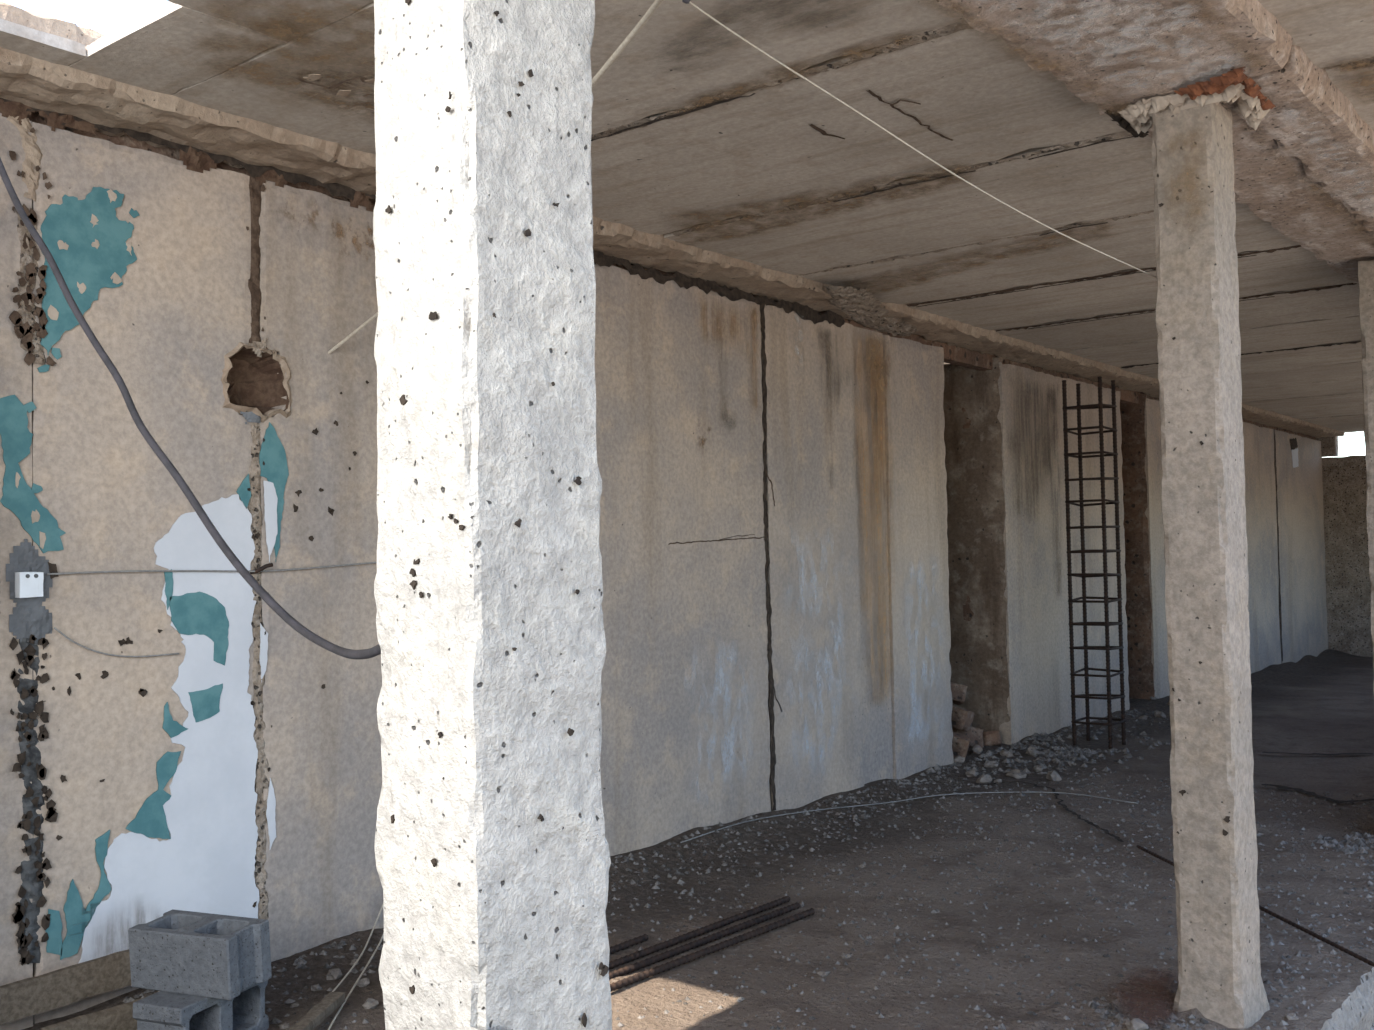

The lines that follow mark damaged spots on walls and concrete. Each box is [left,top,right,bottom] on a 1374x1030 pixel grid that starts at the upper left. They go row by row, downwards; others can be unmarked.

crack [0,98,376,212]
crack [591,20,1134,236]
peeling [7,115,139,373]
crack [1237,245,1302,258]
crack [1239,283,1357,301]
crack [1241,341,1361,355]
crack [593,210,1159,811]
flaking render [0,175,302,966]
crack [980,781,1124,842]